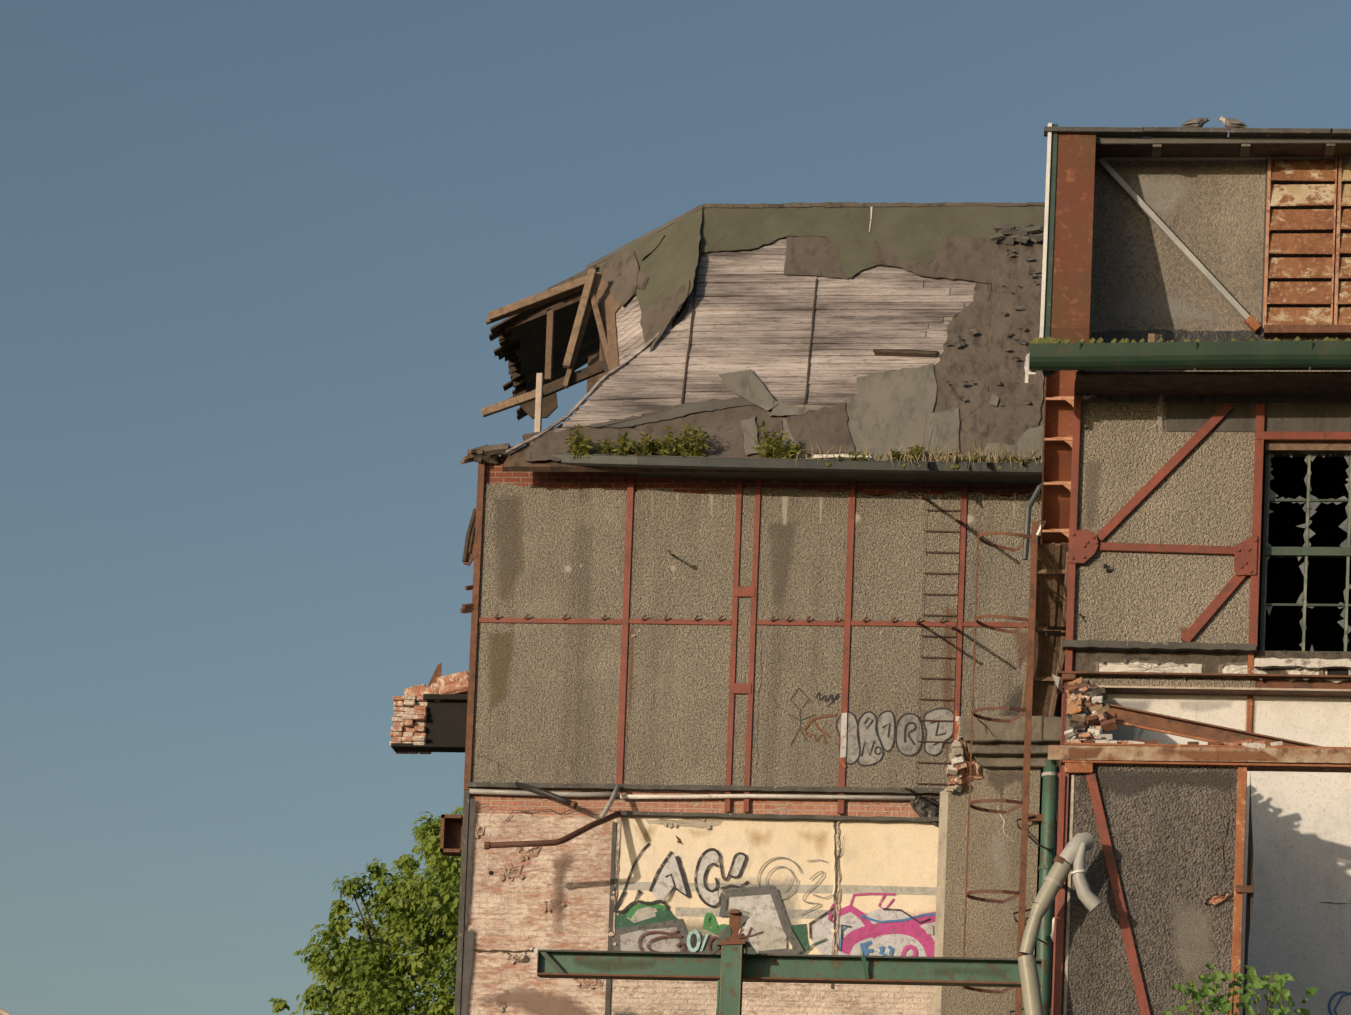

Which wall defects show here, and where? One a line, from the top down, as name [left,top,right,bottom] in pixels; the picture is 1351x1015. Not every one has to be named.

leakage [491,635,510,702]
spalling [1052,650,1351,740]
spalling [927,716,982,798]
spalling [489,847,542,881]
leakage [460,799,588,1015]
spalling [573,979,604,993]